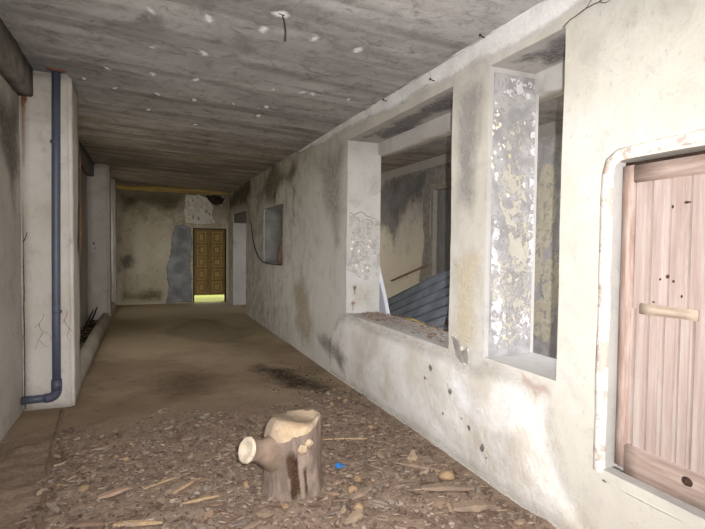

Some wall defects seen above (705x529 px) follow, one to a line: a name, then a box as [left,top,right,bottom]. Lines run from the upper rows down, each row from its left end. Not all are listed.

peeling [184,194,226,225]
damp [380,171,426,232]
peeling [488,72,563,359]
flaking render [451,334,470,365]